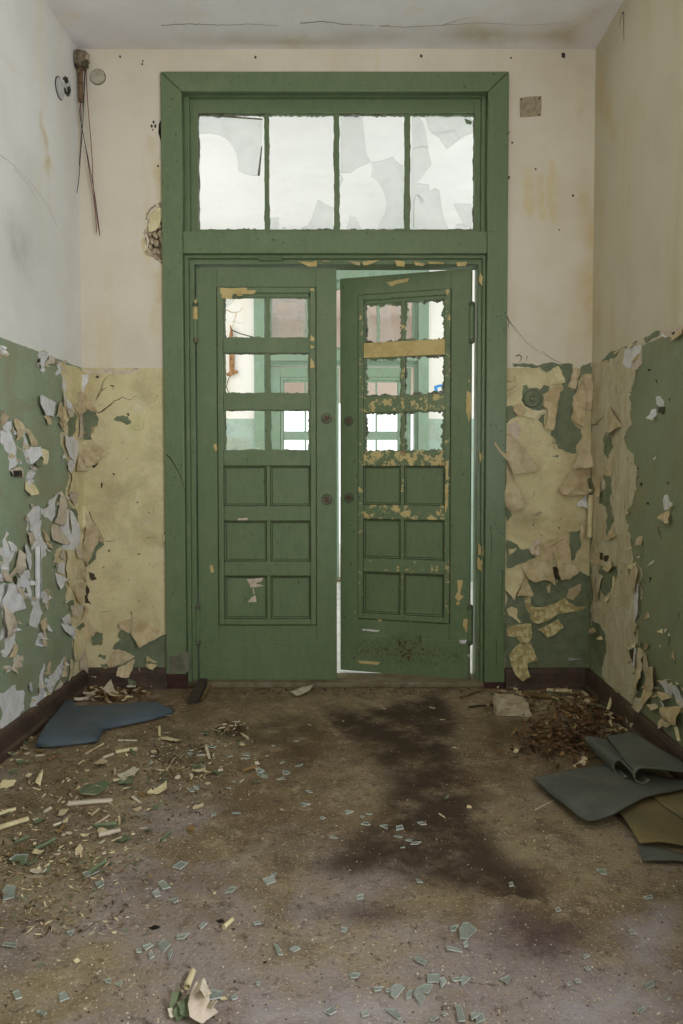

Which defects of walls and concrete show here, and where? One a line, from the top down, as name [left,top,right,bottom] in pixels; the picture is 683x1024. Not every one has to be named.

flaking render [141,202,162,264]
peeling [0,350,189,728]
flaking render [494,323,683,728]